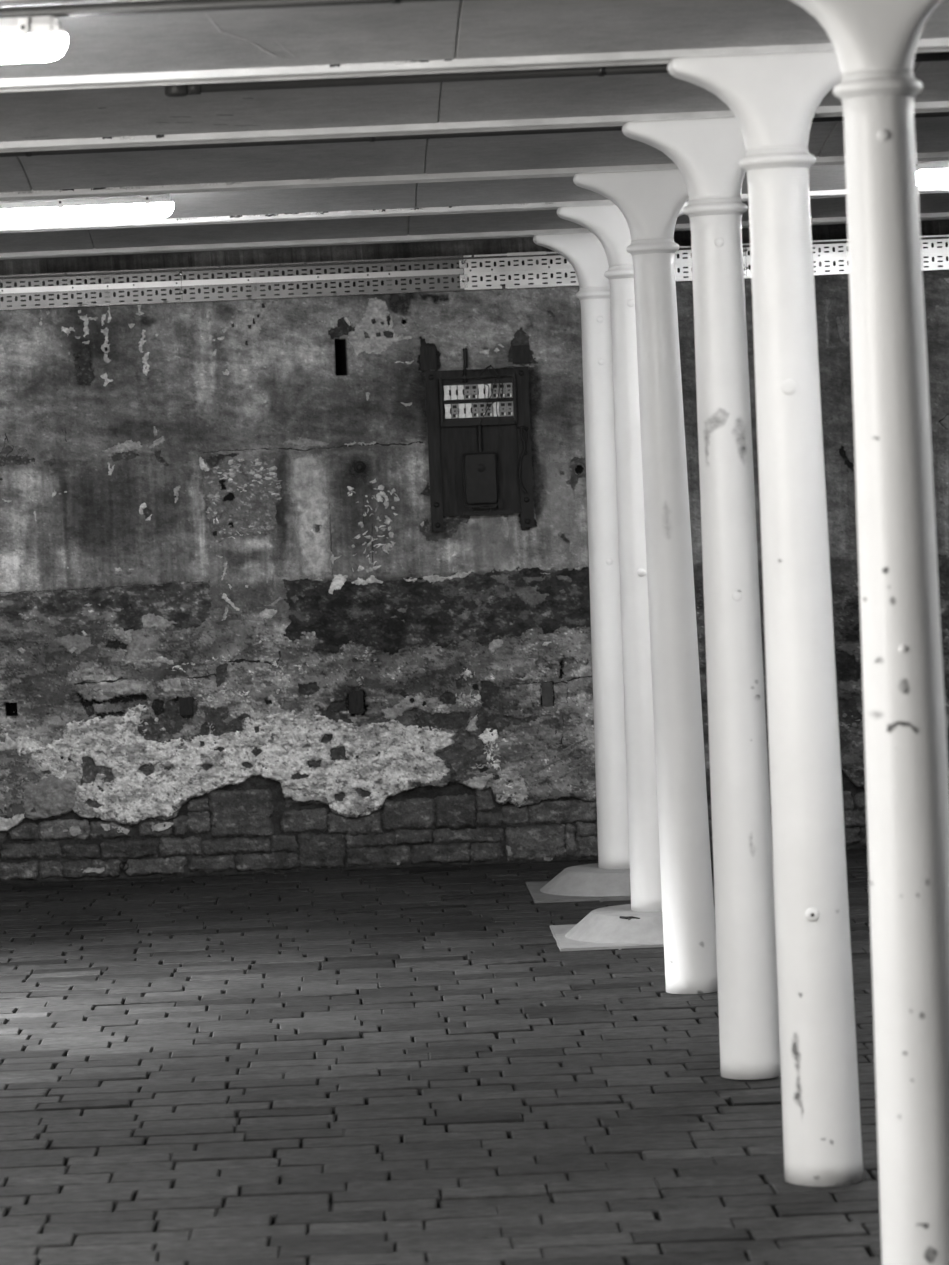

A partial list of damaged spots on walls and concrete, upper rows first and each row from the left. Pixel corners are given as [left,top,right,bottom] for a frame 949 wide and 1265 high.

peeling [60,306,113,387]
peeling [128,305,158,376]
peeling [328,297,441,376]
leakage [292,456,329,576]
peeling [937,554,949,650]
peeling [0,453,598,884]
spalling [835,649,862,682]
spalling [837,697,863,743]
flaking render [841,771,868,849]